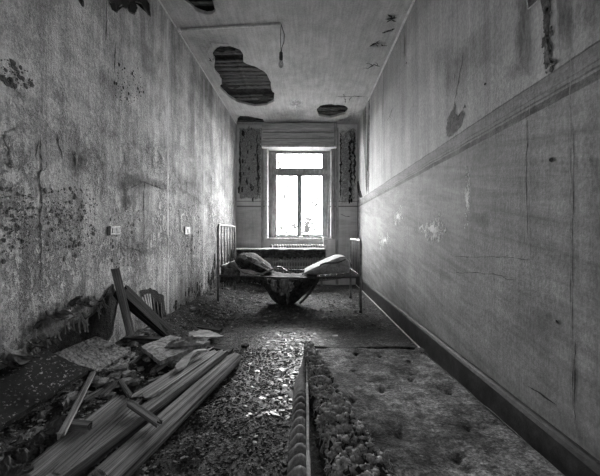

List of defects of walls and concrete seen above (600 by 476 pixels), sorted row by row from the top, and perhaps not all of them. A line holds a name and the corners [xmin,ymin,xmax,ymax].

flaking render [108,0,151,17]
peeling [526,0,557,74]
crack [35,129,47,273]
peeling [238,127,261,202]
peeling [339,102,370,204]